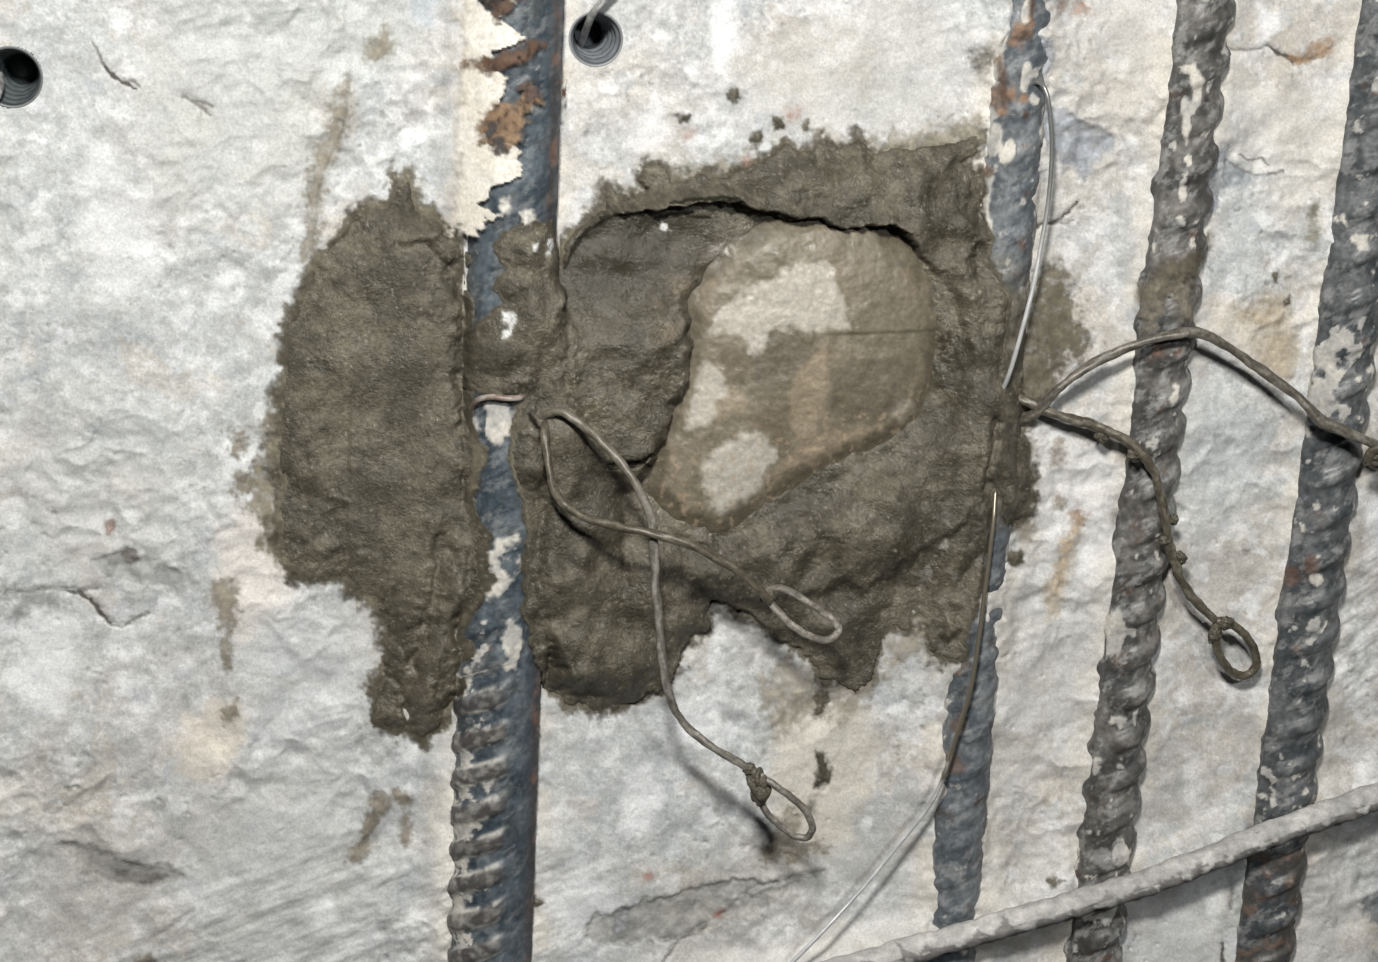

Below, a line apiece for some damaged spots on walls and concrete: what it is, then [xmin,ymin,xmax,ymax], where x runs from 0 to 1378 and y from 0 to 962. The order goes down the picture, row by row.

rust [485,0,514,24]
rust [462,39,547,75]
spalling [1041,38,1055,75]
peeling [449,0,535,237]
rust [478,82,545,155]
spalling [1043,108,1112,179]
crack [564,195,916,269]
spalling [586,873,816,945]
spalling [1362,894,1378,923]